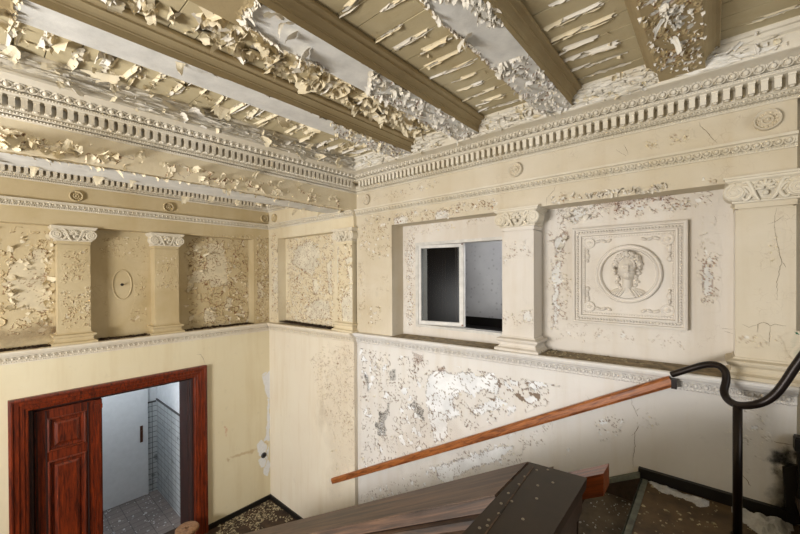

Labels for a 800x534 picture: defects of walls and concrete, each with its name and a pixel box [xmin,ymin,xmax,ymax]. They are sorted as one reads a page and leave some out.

peeling [0,0,800,170]
peeling [0,124,342,218]
peeling [0,195,503,346]
peeling [546,176,723,332]
peeling [309,341,579,504]